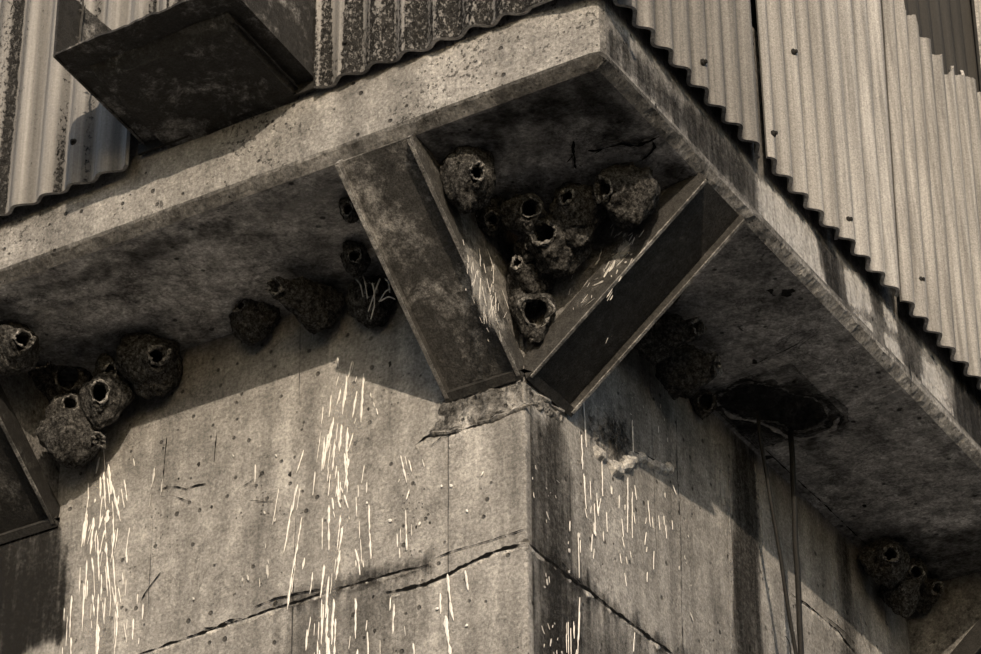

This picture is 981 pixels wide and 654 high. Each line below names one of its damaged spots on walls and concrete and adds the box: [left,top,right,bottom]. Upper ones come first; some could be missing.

crack [159,434,206,500]
crack [415,404,516,450]
leakage [530,402,608,654]
leakage [619,478,673,586]
crack [140,529,683,654]
crack [790,593,855,654]